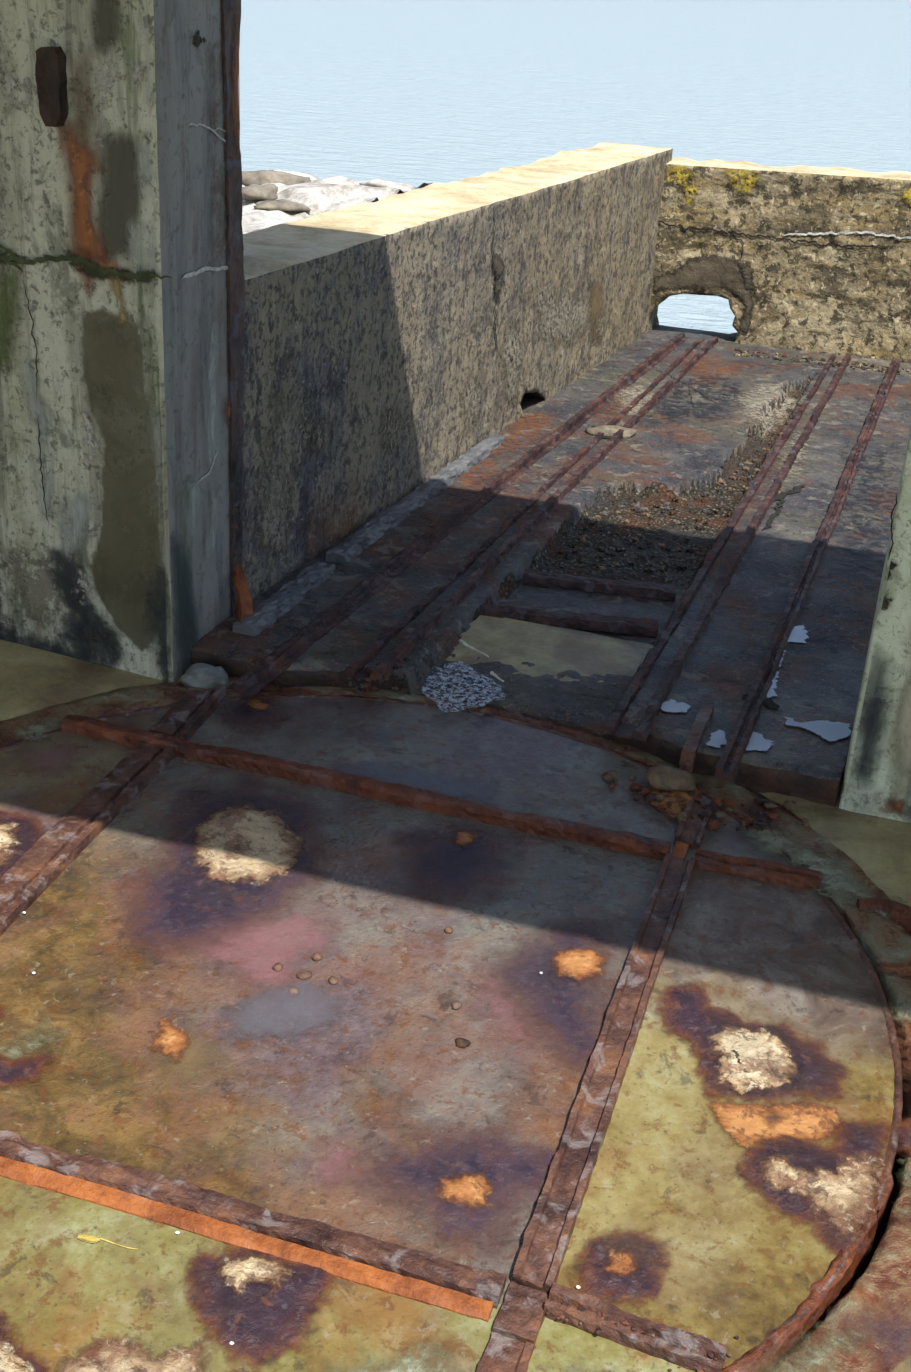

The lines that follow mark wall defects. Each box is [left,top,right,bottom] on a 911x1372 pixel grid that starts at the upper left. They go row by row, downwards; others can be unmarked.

spalling [654,253,757,334]
crack [658,221,911,261]
crack [0,245,228,526]
leakage [0,309,200,683]
leakage [856,660,911,794]
corrosion [499,921,608,1066]
peeling [56,1334,210,1372]
corrosion [186,1246,334,1372]
corrosion [376,1134,556,1242]
corrosion [574,1231,670,1303]
corrosion [657,984,911,1372]
spalling [839,1140,900,1300]